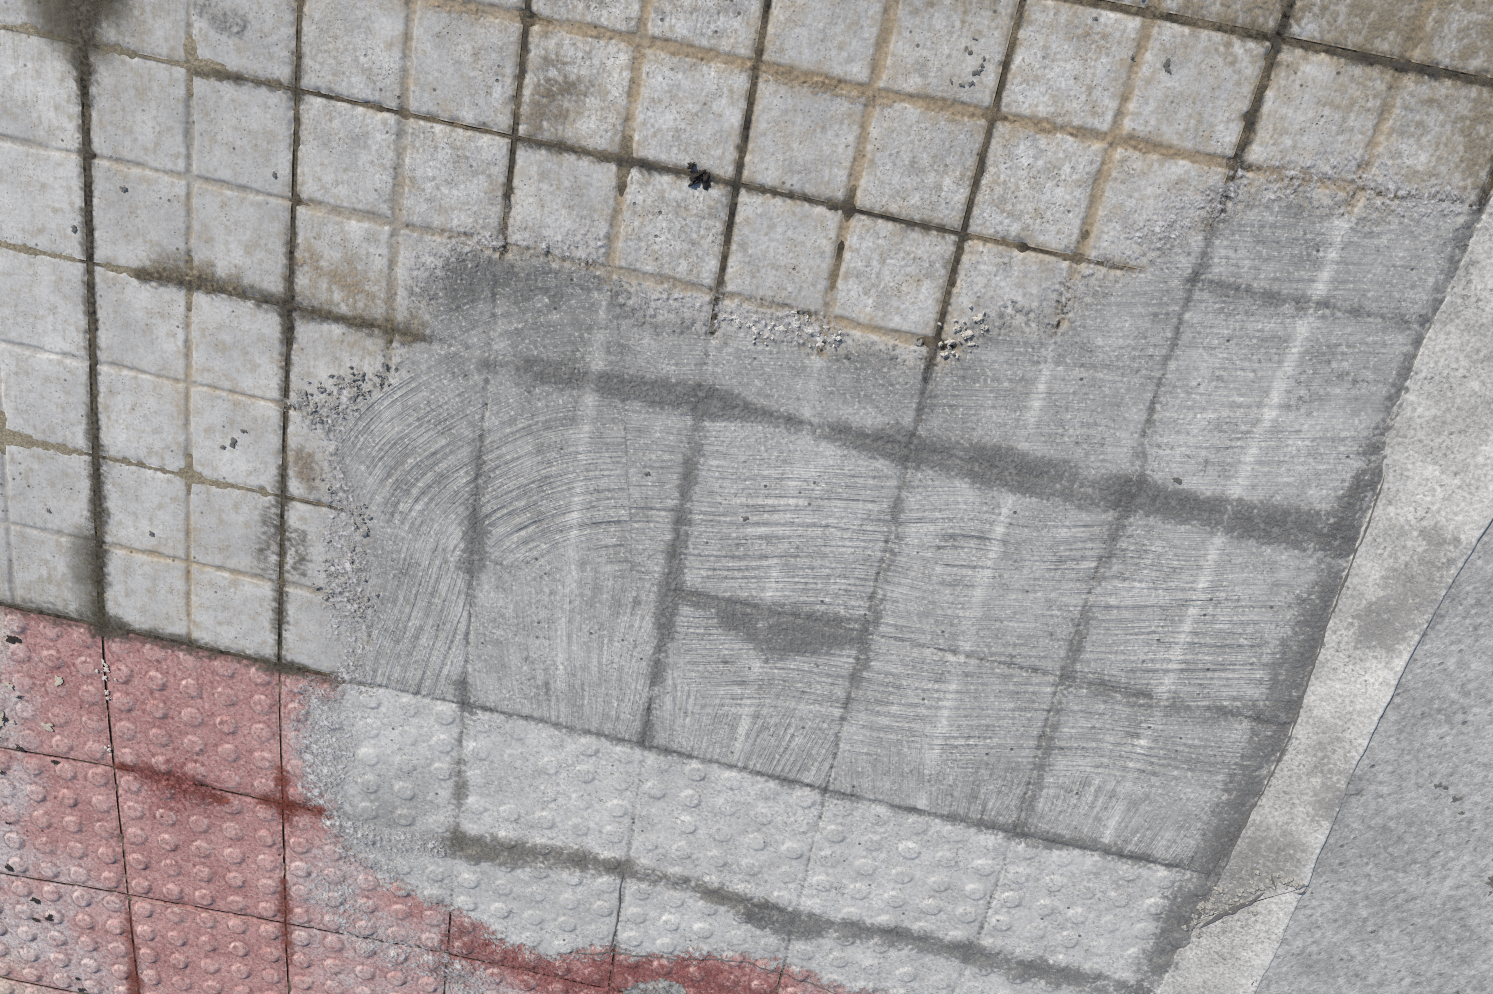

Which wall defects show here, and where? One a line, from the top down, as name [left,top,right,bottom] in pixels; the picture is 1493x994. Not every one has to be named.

water stain [66,0,101,105]
water stain [76,441,109,604]